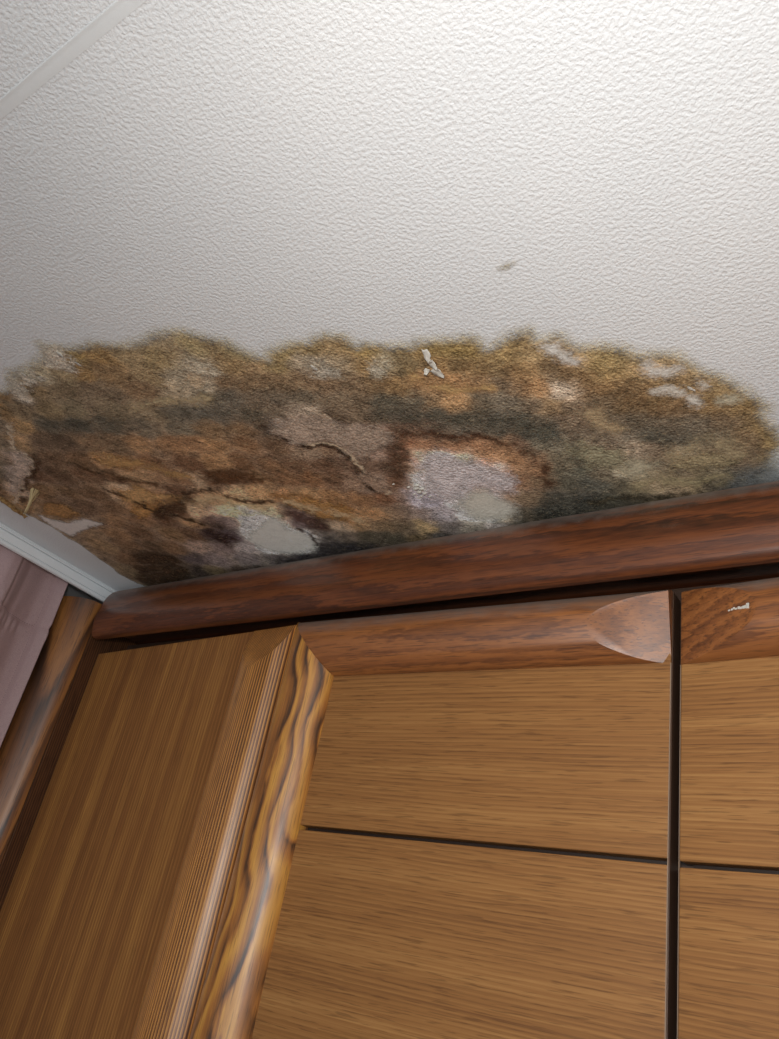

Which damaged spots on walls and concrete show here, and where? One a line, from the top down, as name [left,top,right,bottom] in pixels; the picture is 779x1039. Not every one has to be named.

water stain [0,329,779,586]